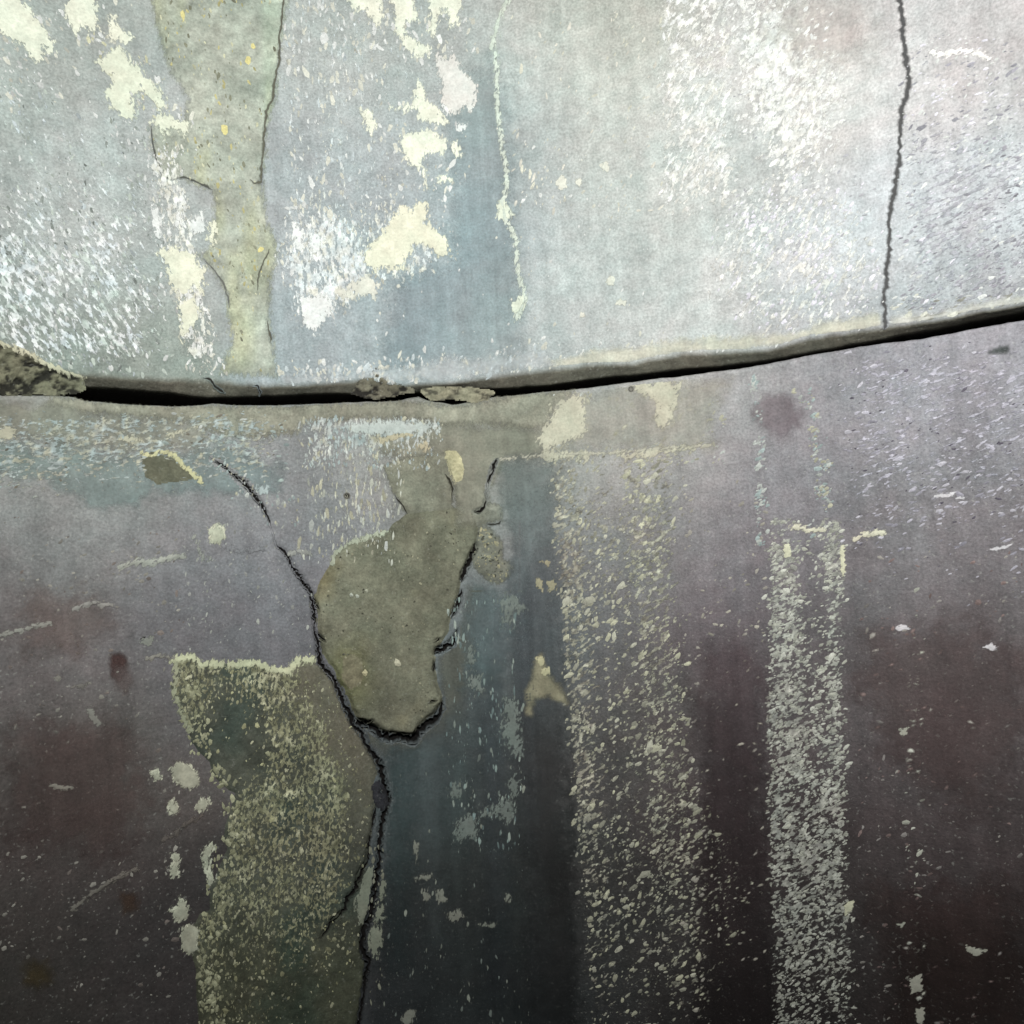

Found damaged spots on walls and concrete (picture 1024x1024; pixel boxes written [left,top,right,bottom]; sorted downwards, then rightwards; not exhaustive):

crack [250,0,285,185]
crack [150,126,212,190]
crack [880,0,914,330]
crack [203,258,230,308]
spalling [0,341,87,396]
peeling [351,368,495,403]
spalling [139,448,204,485]
peeling [445,450,464,484]
water stain [353,374,977,1024]
crack [199,446,447,1024]
peeling [169,652,389,1024]
water stain [965,943,1008,956]